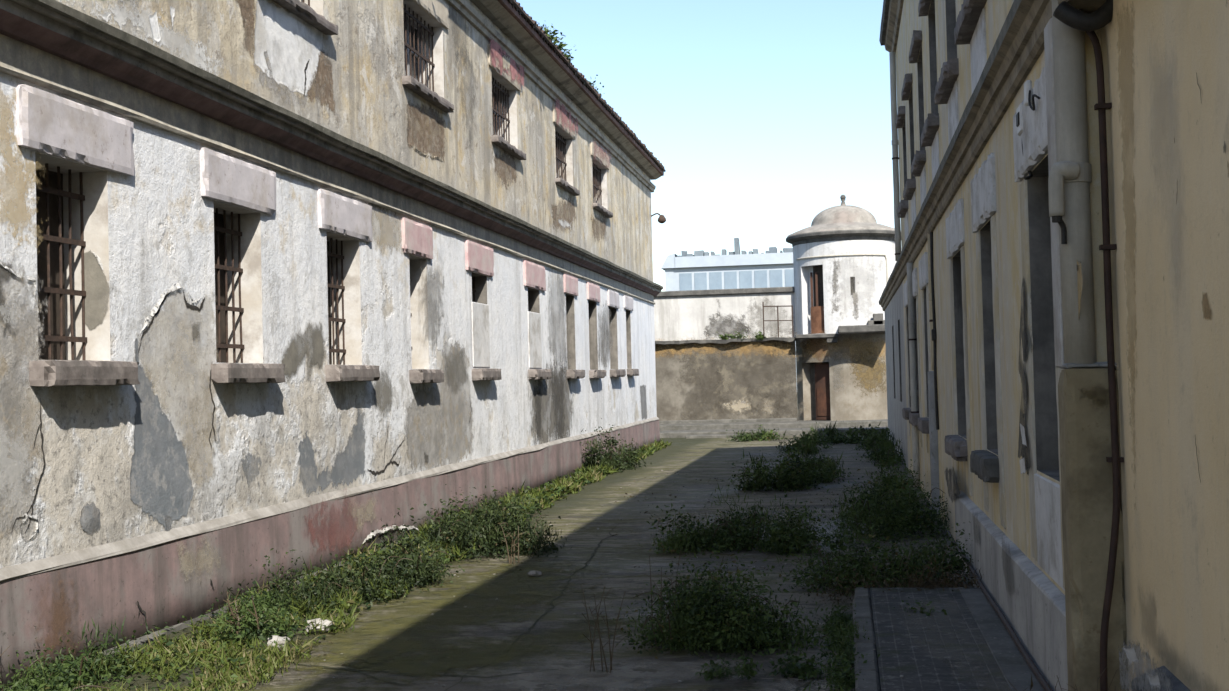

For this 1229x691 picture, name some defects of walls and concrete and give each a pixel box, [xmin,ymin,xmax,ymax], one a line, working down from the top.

peeling [61,0,224,76]
flaking render [236,0,335,112]
peeling [0,96,36,245]
peeling [138,282,205,353]
flaking render [0,261,47,542]
crack [208,370,216,448]
crack [11,398,46,533]